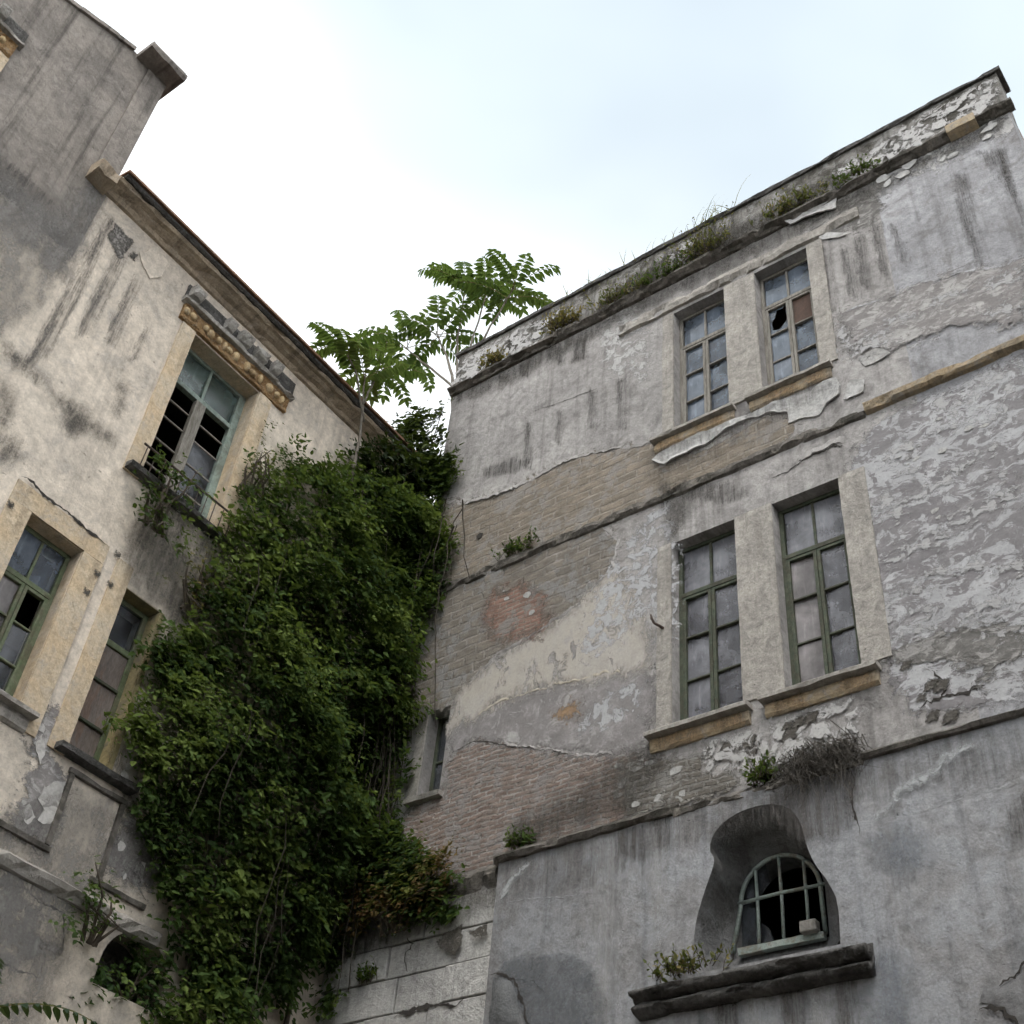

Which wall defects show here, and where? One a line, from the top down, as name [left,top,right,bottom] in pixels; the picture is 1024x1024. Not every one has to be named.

leakage [0,164,119,378]
leakage [456,117,1004,402]
peeling [785,79,1014,241]
leakage [992,150,1019,210]
leakage [59,399,111,441]
leakage [486,424,531,476]
peeling [845,349,1024,724]
spalling [391,377,866,881]
peeling [4,703,72,854]
crack [458,741,531,750]